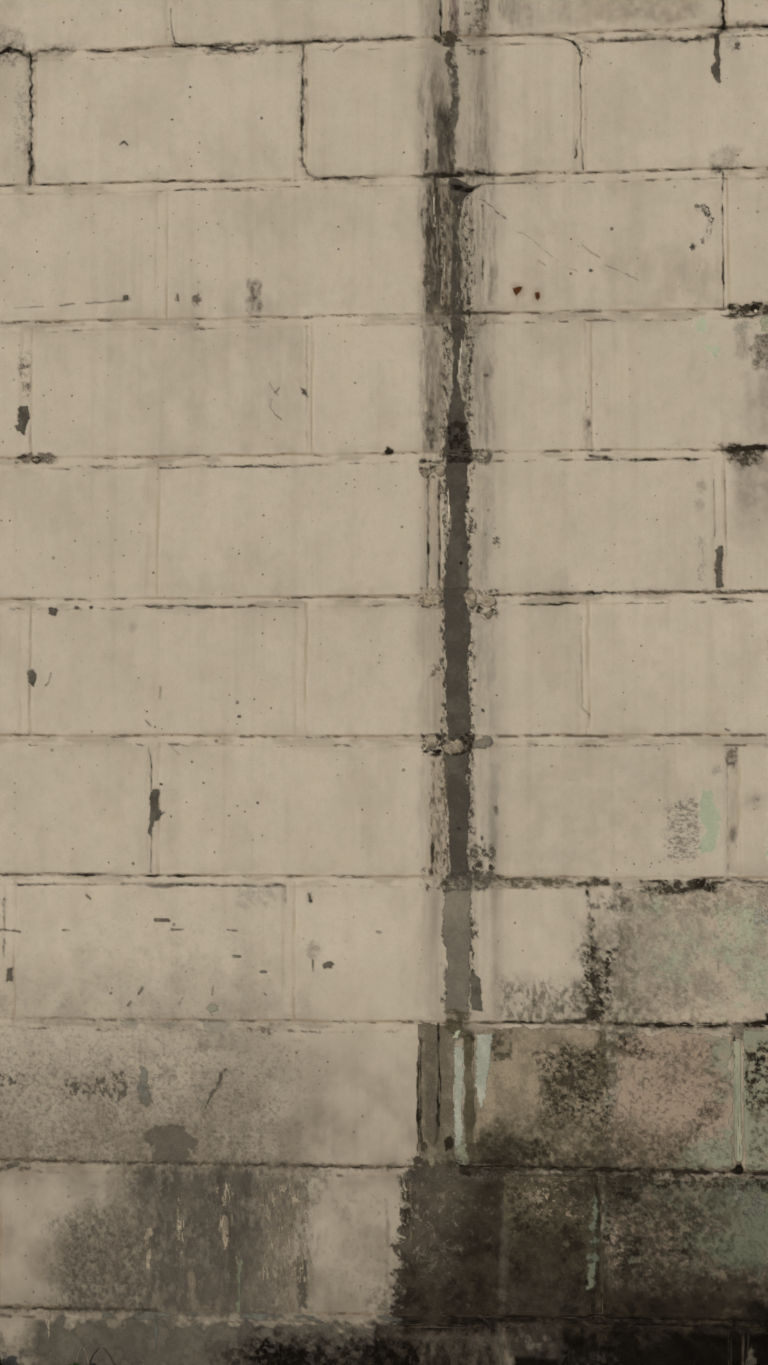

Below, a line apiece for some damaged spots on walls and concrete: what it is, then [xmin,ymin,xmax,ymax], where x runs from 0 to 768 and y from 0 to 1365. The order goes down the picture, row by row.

leakage [4,603,768,1365]
peeling [416,178,482,1167]
leakage [421,0,492,687]
leakage [726,301,768,317]
leakage [727,444,768,466]